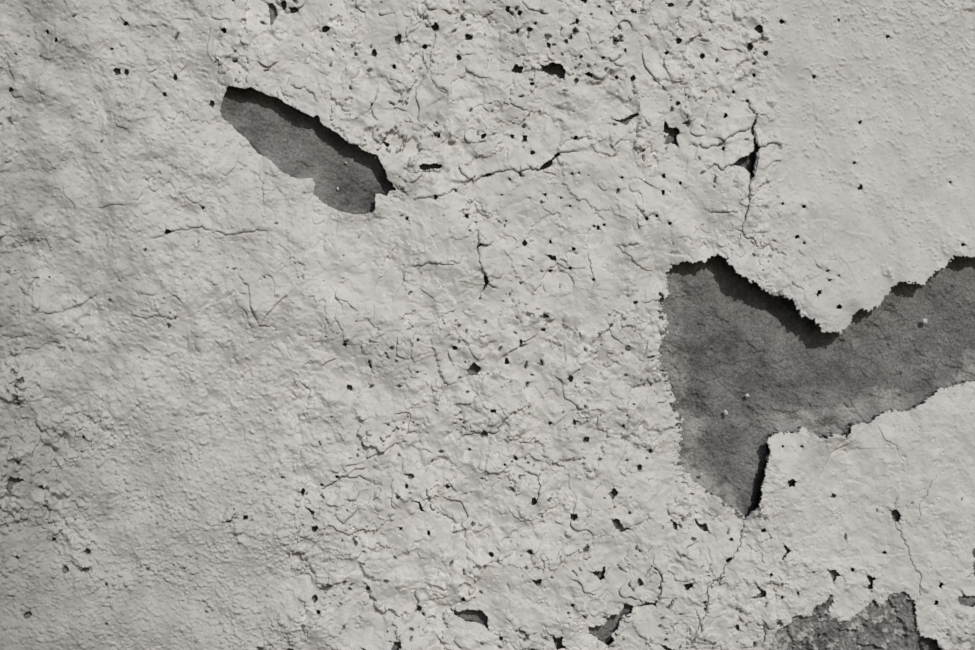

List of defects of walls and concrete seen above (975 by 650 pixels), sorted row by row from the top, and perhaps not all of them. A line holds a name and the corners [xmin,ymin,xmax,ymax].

peeling [232,0,298,32]
peeling [208,28,406,227]
crack [441,152,560,196]
peeling [663,91,698,147]
crack [699,100,782,218]
peeling [593,114,975,541]
peeling [762,570,975,650]